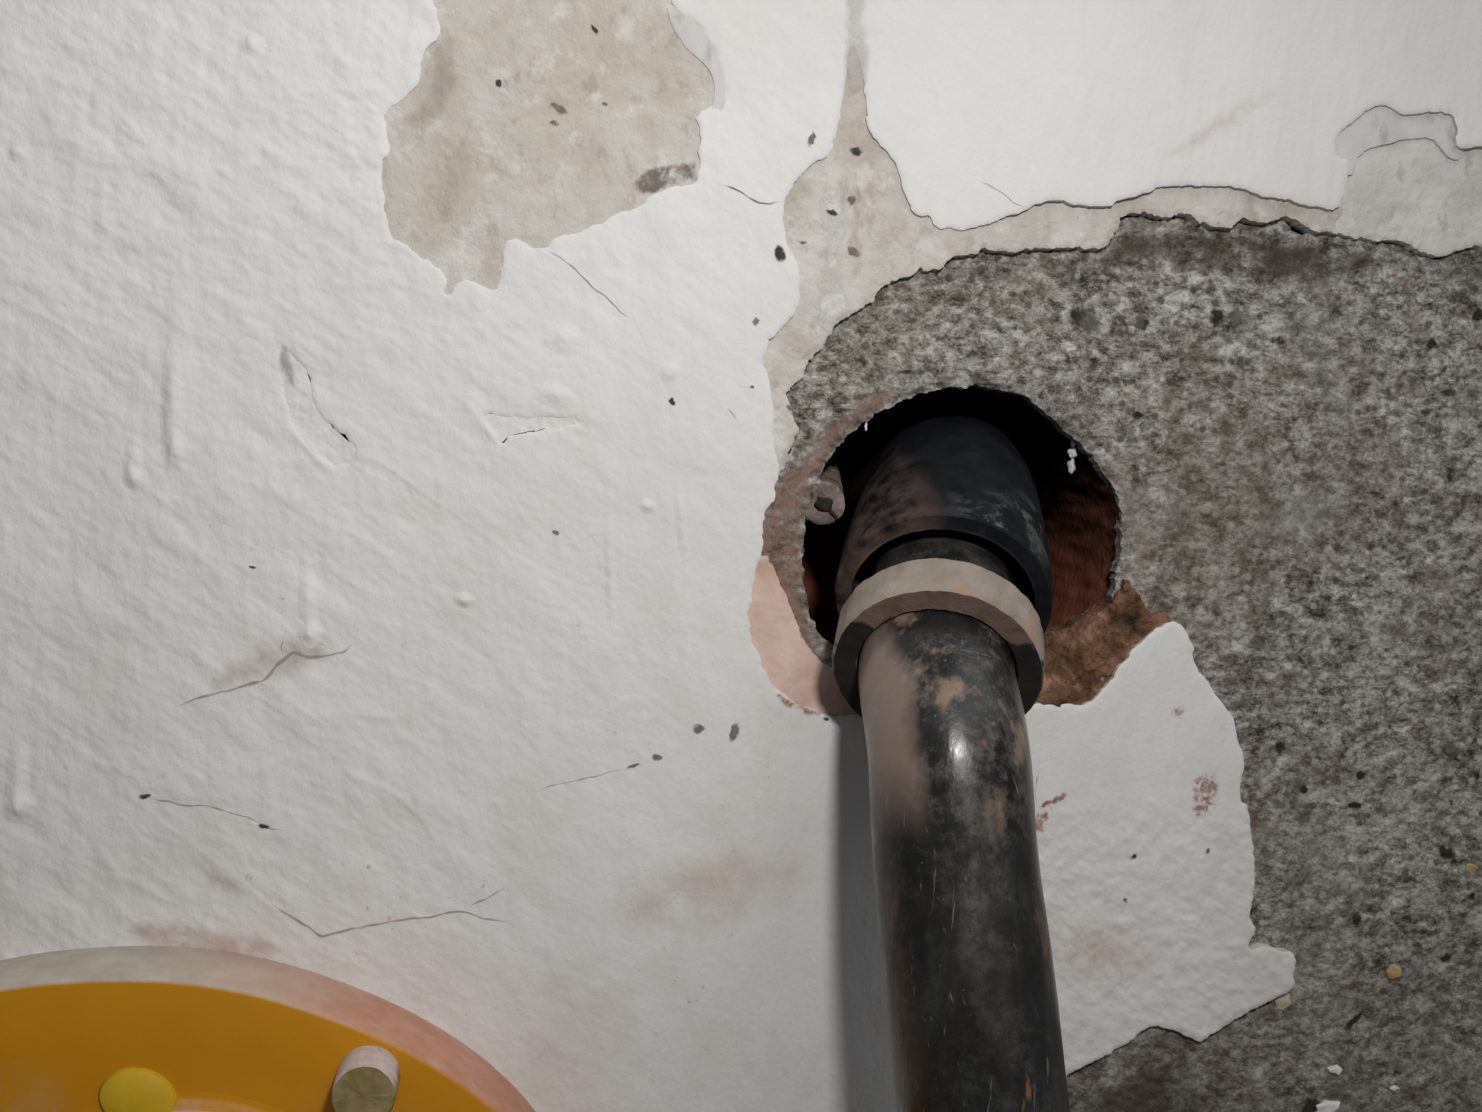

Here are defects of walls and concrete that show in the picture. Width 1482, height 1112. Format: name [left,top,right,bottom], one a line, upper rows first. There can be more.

peeling [382,0,726,295]
spalling [748,47,1482,1112]
crack [187,645,345,703]
rust [1036,794,1065,831]
rust [1195,779,1217,810]
crack [280,892,498,937]